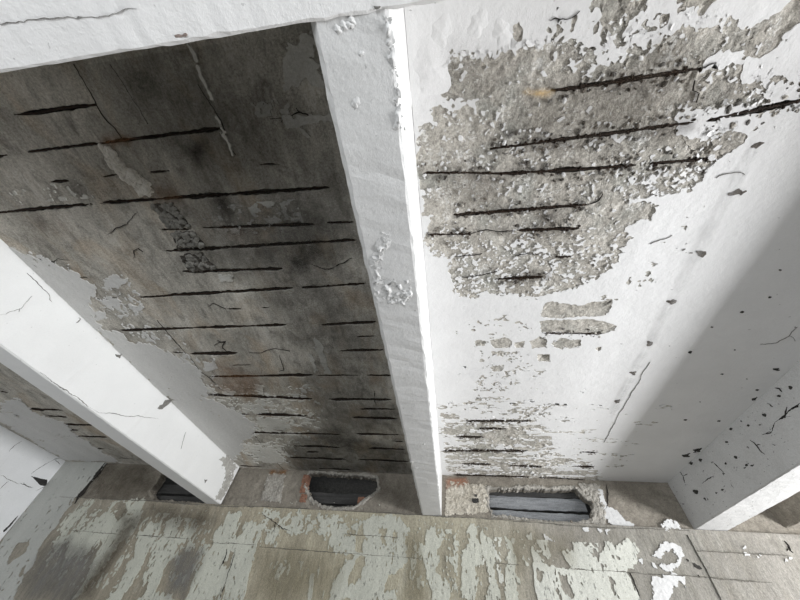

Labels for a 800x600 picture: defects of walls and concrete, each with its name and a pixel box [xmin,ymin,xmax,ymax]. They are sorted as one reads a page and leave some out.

crack [2,8,134,24]
crack [73,64,122,138]
crack [692,62,717,103]
crack [6,256,87,314]
peeling [302,232,413,307]
spalling [415,0,800,480]
crack [40,372,150,418]
peeling [9,247,357,500]
crack [604,363,650,442]
crack [750,388,800,454]
peeling [0,391,702,600]